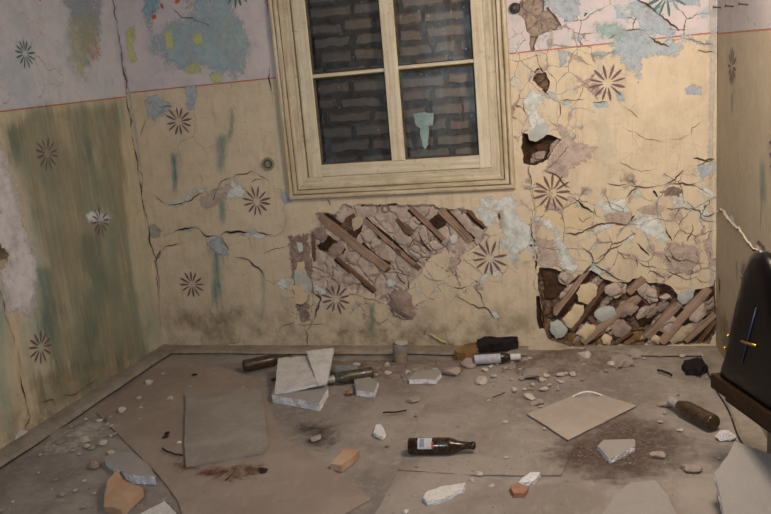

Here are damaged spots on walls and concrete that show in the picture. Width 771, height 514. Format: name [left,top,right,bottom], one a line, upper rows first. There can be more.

spalling [518,0,580,51]
crack [113,0,762,344]
peeling [521,68,595,178]
spalling [0,244,9,270]
spalling [276,187,716,358]